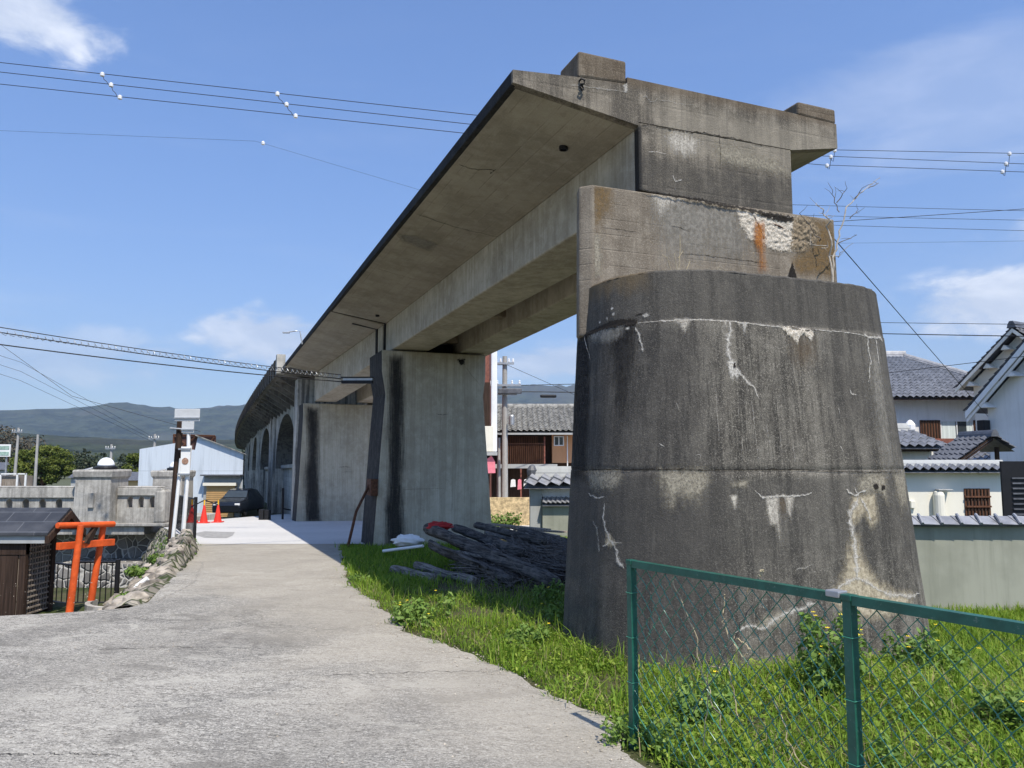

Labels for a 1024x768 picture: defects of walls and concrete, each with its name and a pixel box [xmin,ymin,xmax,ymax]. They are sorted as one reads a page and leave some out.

rust [755,223,765,267]
spalling [736,208,820,255]
water stain [305,407,320,521]
water stain [386,357,404,544]
crack [575,397,920,631]